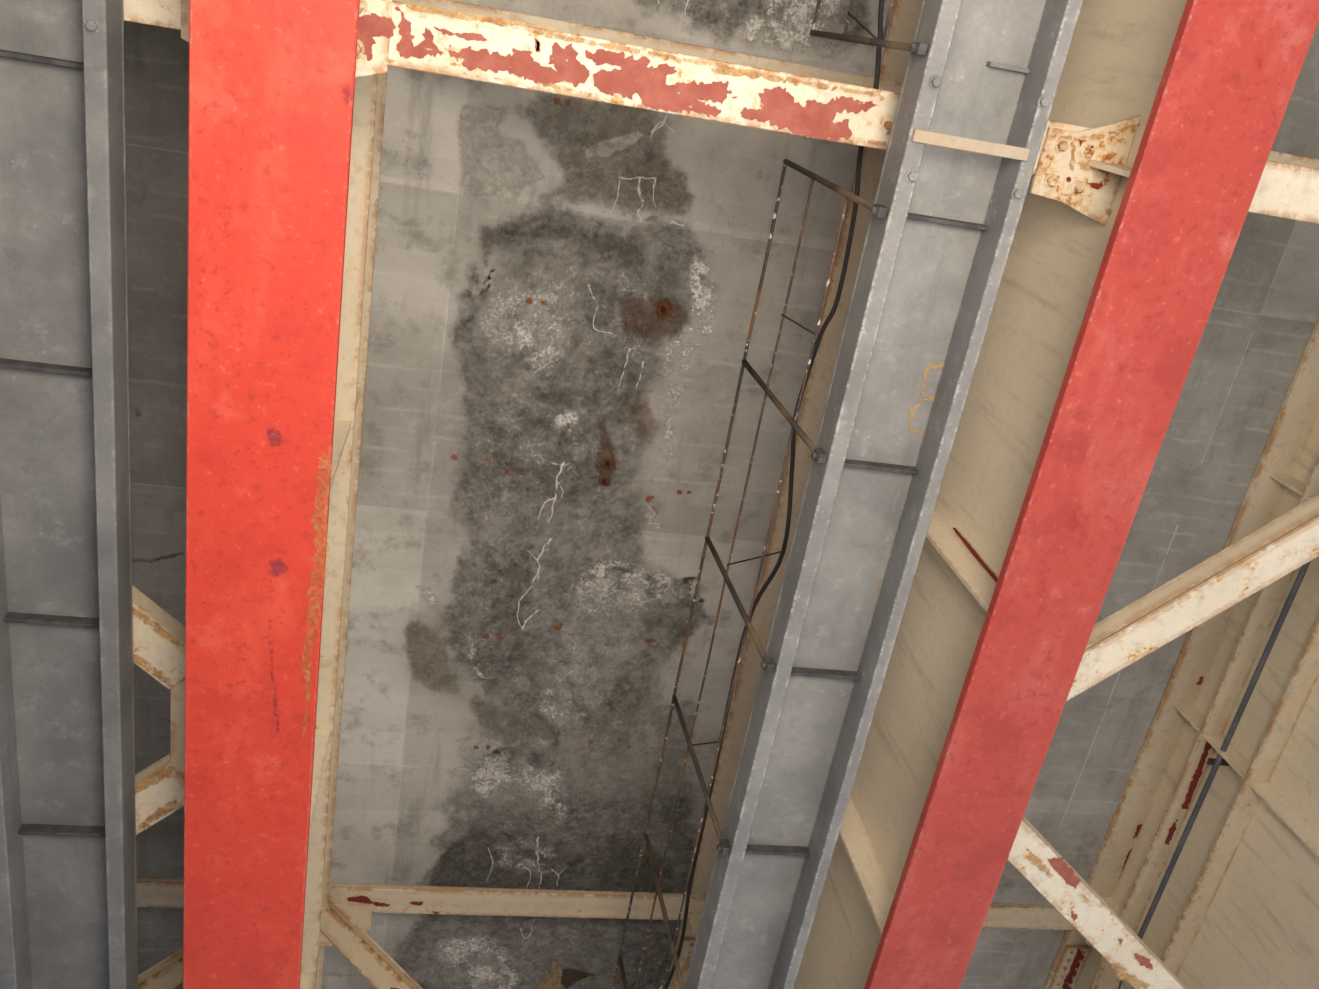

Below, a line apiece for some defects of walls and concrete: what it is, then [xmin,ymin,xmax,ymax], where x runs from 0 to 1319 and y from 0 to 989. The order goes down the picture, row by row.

water stain [650,0,868,52]
peeling [358,0,876,142]
rust [1046,125,1139,178]
crack [609,176,684,226]
crack [587,284,644,387]
rust [620,298,686,340]
rust [596,422,616,487]
water stain [407,95,715,894]
crack [517,462,569,629]
peeling [1047,857,1081,889]
water stain [395,914,681,989]
peeling [1134,954,1153,970]